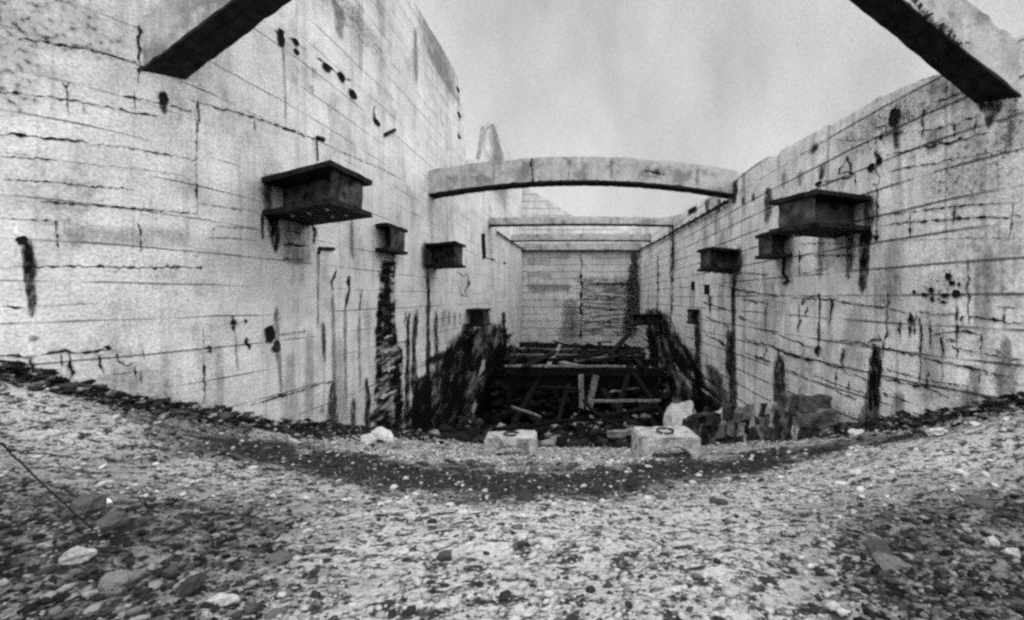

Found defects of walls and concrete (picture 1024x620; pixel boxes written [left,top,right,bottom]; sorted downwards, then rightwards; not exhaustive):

leakage [15,236,37,316]
leakage [396,324,516,432]
leakage [529,253,728,413]